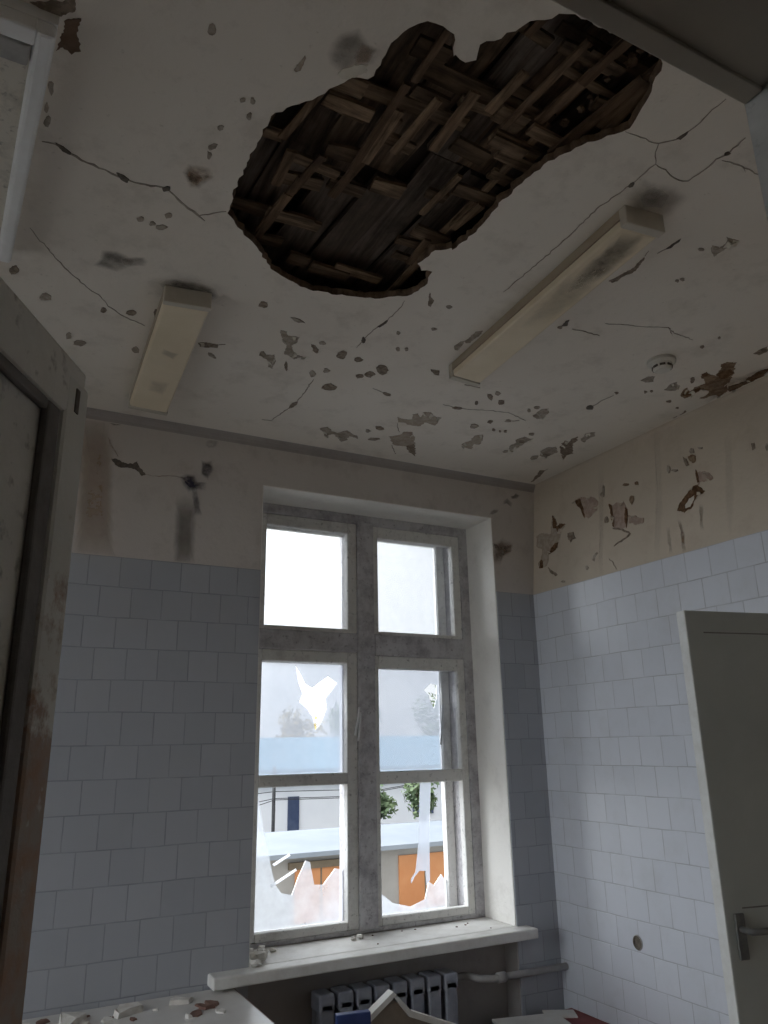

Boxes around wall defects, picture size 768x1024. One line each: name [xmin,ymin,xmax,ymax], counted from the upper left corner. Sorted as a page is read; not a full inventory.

peeling [30,0,81,55]
damp [337,64,368,79]
crack [42,141,226,221]
crack [504,99,758,292]
crack [30,228,145,326]
peeling [259,330,326,371]
peeling [336,350,389,379]
crack [262,379,314,421]
crack [108,438,189,483]
peeling [320,412,441,456]
damp [178,464,211,548]
peeling [572,481,644,546]